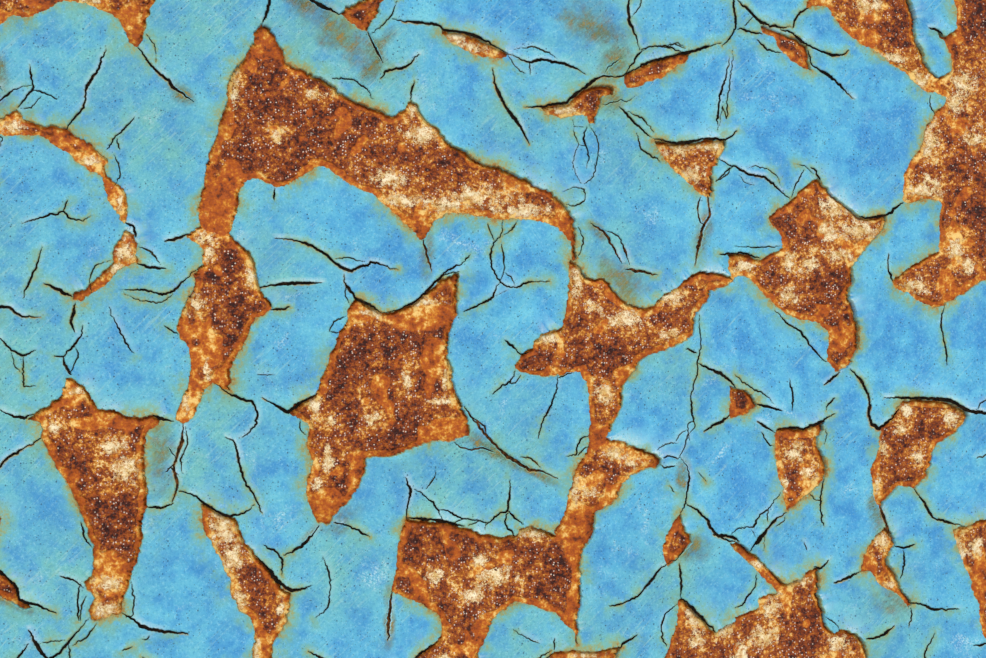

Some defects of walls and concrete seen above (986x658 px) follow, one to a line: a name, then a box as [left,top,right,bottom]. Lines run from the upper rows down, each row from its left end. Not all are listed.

peeling [0,111,138,301]
peeling [29,378,159,620]
crack [0,222,202,387]
crack [148,374,317,518]
rust [322,17,386,75]
crack [259,222,549,333]
peeling [176,25,885,658]
rust [565,14,609,38]
crack [332,0,852,275]
crack [658,309,986,551]
peeling [806,0,986,307]
peeling [870,399,966,509]